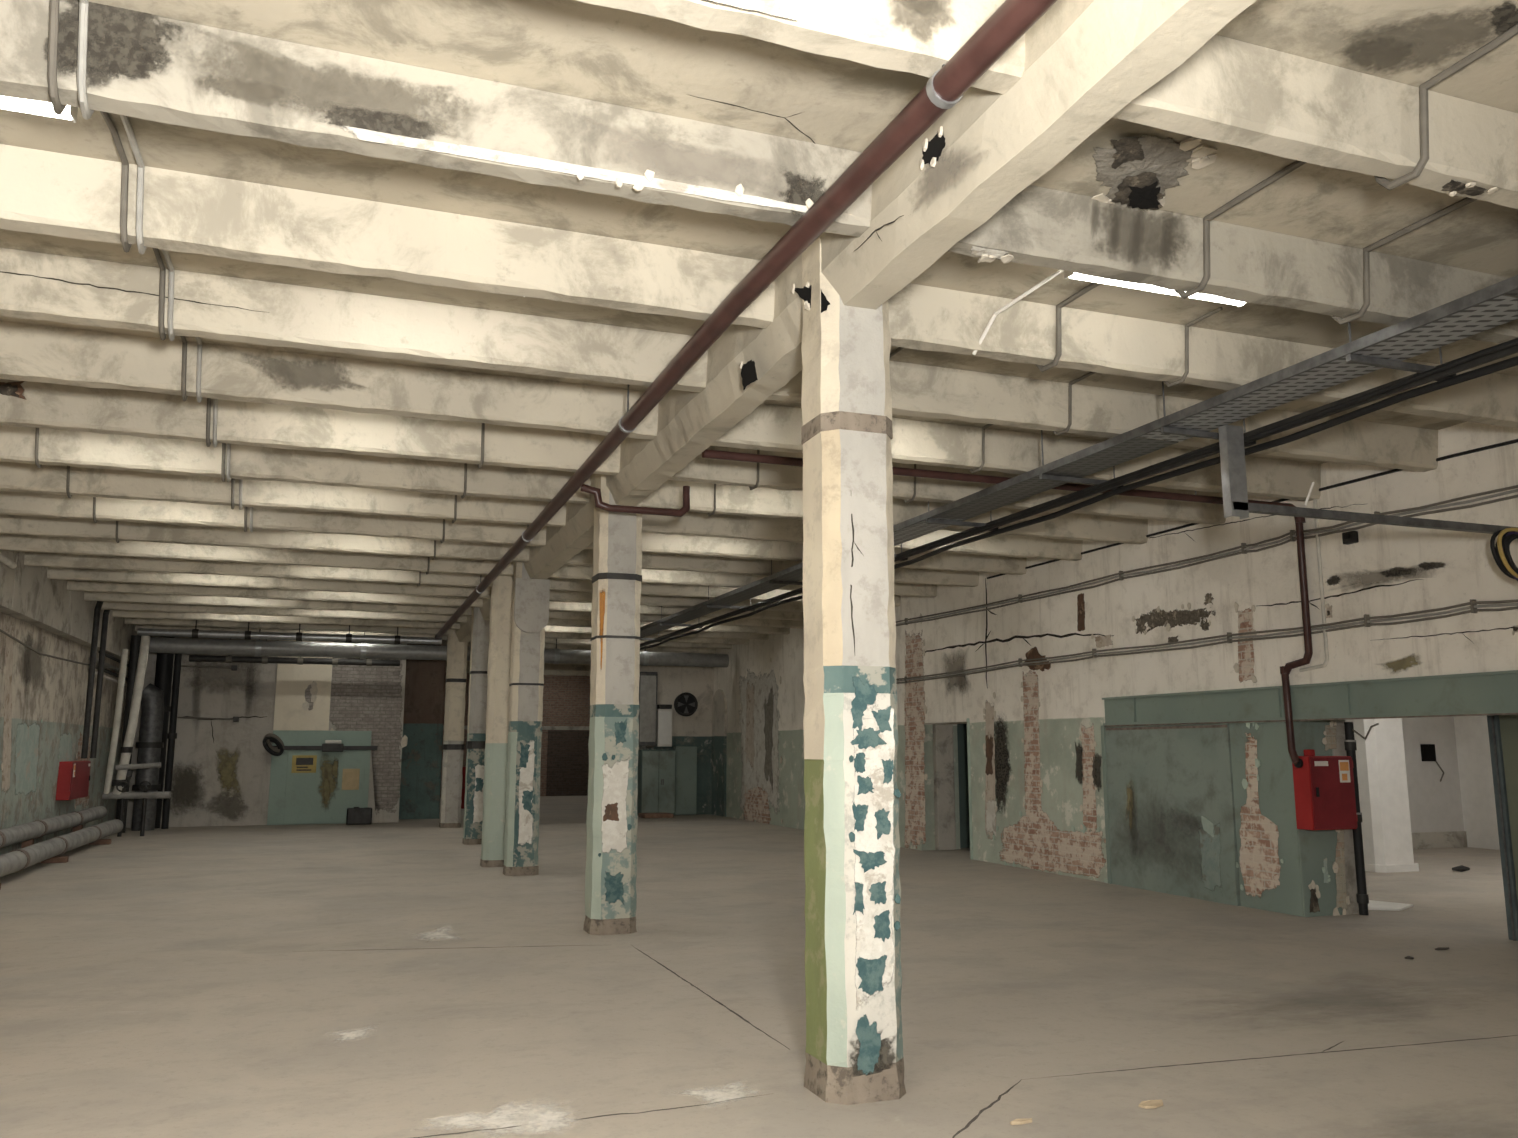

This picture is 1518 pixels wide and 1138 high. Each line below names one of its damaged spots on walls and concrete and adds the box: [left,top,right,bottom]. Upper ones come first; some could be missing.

mould [45,0,181,87]
damp [893,0,949,41]
damp [1347,2,1518,71]
damp [1100,205,1184,265]
flaking render [1,625,14,794]
peeling [514,740,537,856]
peeling [598,719,632,904]
peeling [849,613,928,1075]
flaking render [983,647,1108,883]
flaking render [1236,722,1284,898]